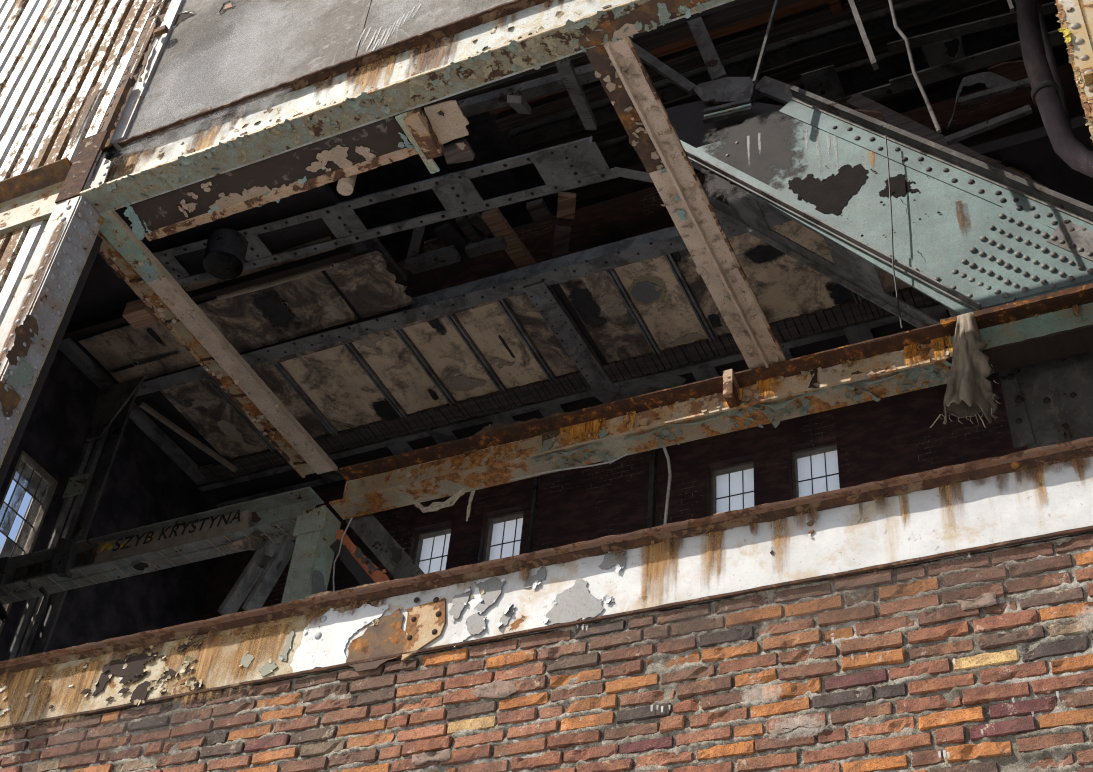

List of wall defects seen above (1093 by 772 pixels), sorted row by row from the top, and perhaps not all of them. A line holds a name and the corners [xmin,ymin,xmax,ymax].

peeling [555,0,731,175]
rust [108,136,166,182]
peeling [92,82,390,241]
peeling [788,161,920,219]
rust [0,221,66,360]
peeling [0,314,39,420]
rust [976,454,1089,501]
rust [340,580,390,614]
peeling [543,578,614,625]
rust [0,644,144,728]
peeling [68,635,204,705]
rust [159,591,328,700]